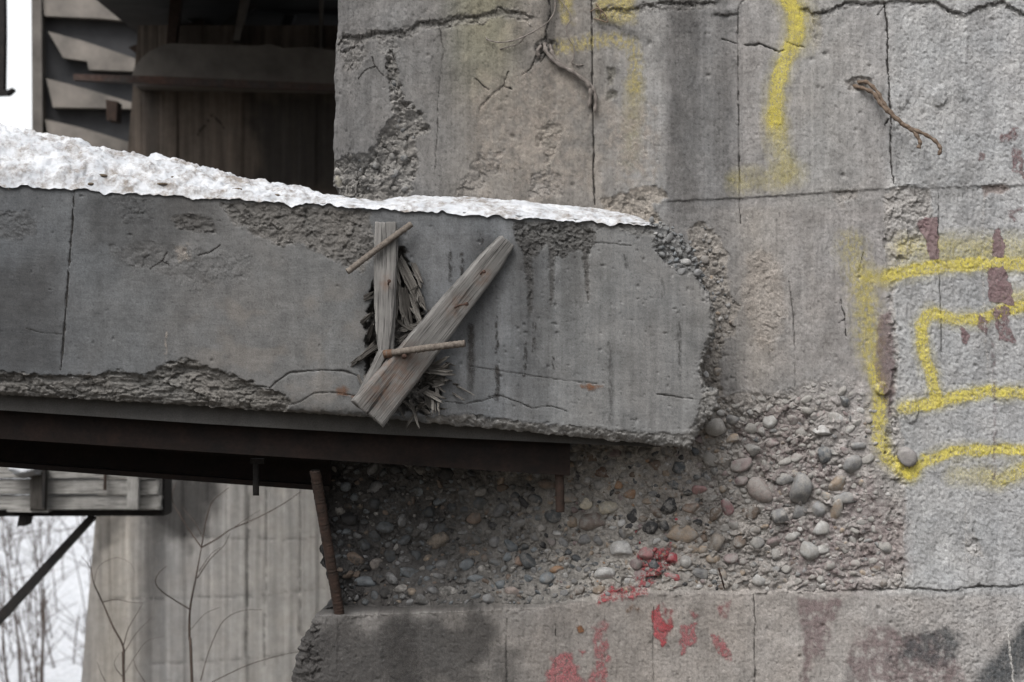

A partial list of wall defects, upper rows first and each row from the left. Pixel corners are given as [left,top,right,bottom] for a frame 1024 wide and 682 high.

spalling [219,5,533,274]
crack [883,5,894,183]
crack [56,196,74,366]
spalling [0,356,366,417]
crack [253,370,357,405]
spalling [291,185,955,682]